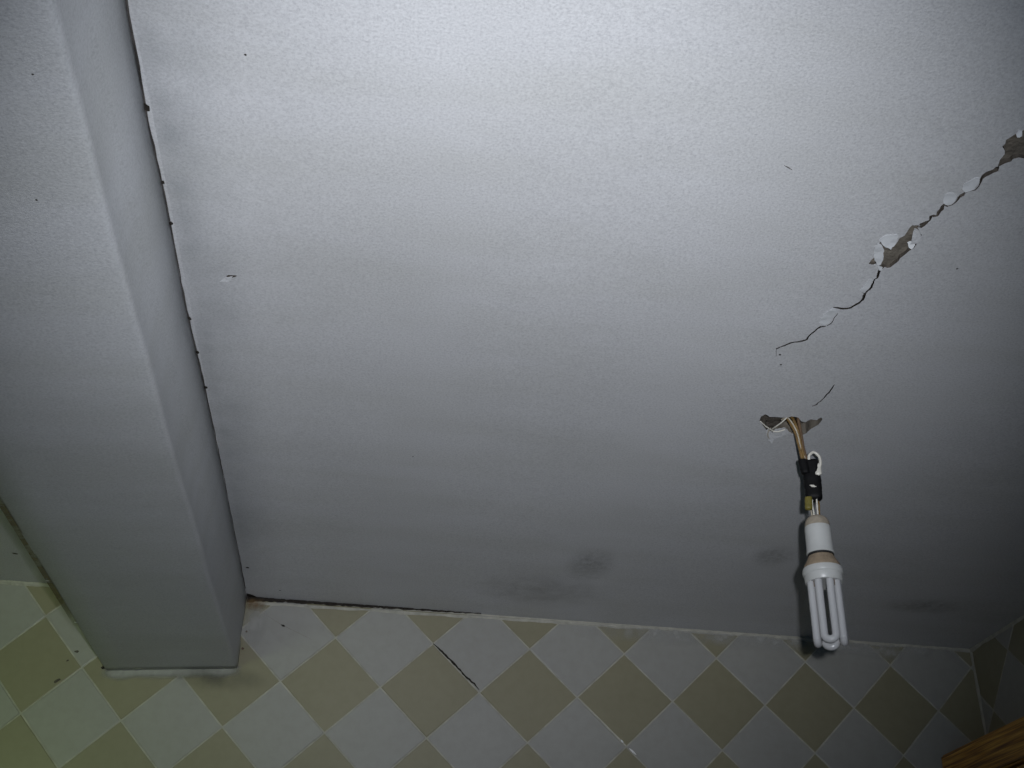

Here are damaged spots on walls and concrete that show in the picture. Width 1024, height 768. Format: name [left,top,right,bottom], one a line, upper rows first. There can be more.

spalling [997,130,1024,168]
crack [917,164,999,228]
spalling [869,225,922,271]
crack [776,270,880,365]
crack [433,643,479,690]